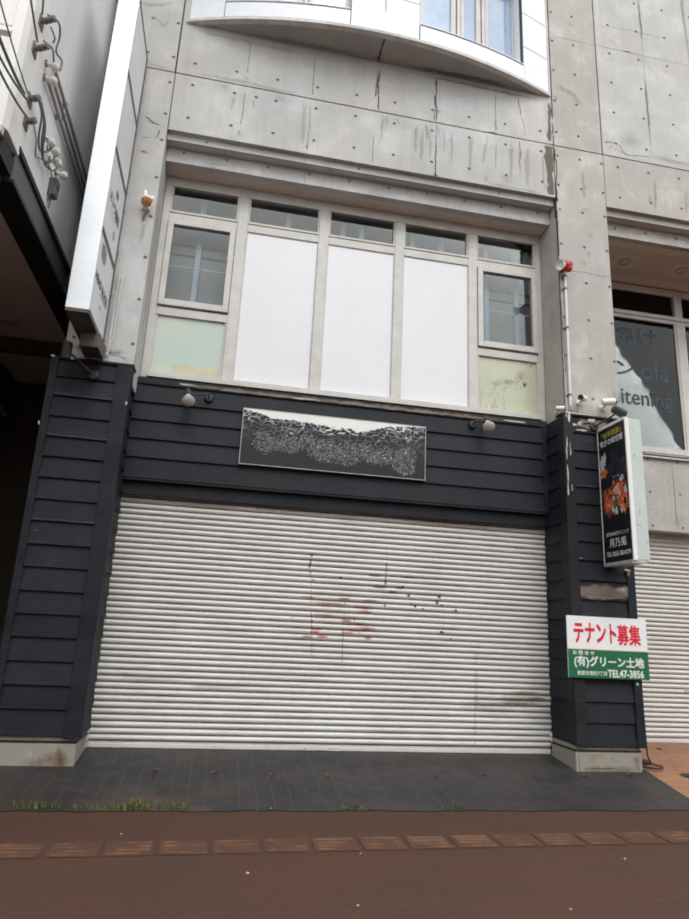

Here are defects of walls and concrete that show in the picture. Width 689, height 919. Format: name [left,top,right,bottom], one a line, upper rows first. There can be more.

crack [372,69,383,162]
damp [544,104,554,195]
crack [554,2,689,150]